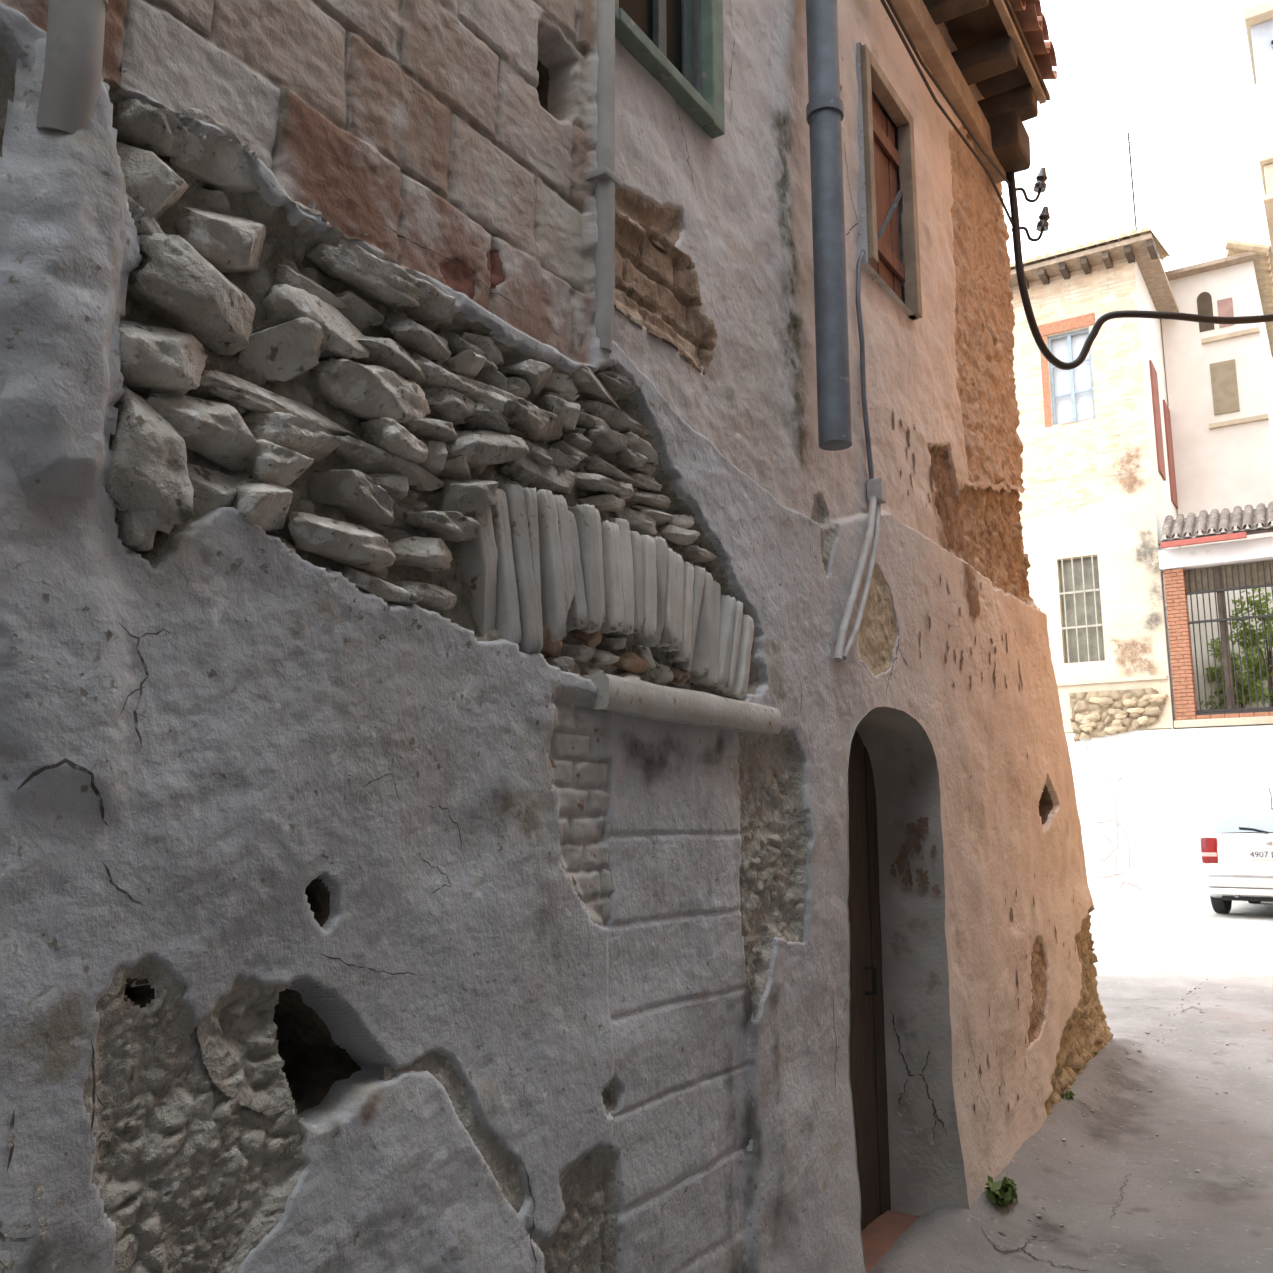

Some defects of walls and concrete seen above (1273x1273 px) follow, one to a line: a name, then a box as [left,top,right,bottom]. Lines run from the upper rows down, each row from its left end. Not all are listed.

spalling [105,92,747,656]
spalling [892,127,1038,608]
crack [17,758,110,827]
crack [118,623,171,748]
spalling [540,626,760,936]
spalling [737,731,808,1020]
spalling [854,564,897,676]
peeling [82,956,305,1273]
peeling [384,1051,526,1213]
spalling [526,1146,619,1273]
crack [890,1010,947,1139]
spalling [1015,907,1114,1115]